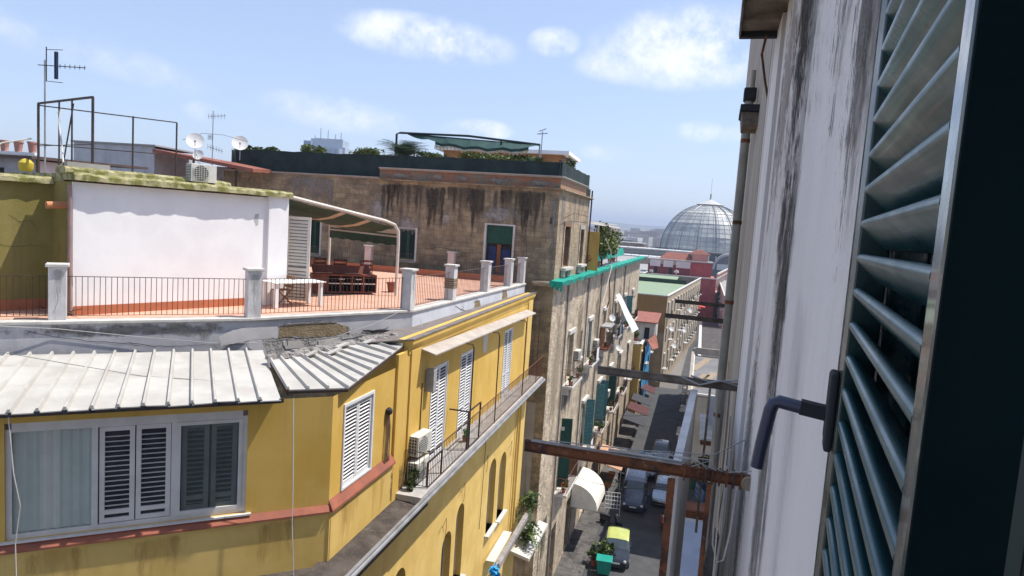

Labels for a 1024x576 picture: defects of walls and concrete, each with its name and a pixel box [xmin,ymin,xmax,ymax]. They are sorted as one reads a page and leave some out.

water stain [382,184,580,271]
spalling [262,319,396,354]